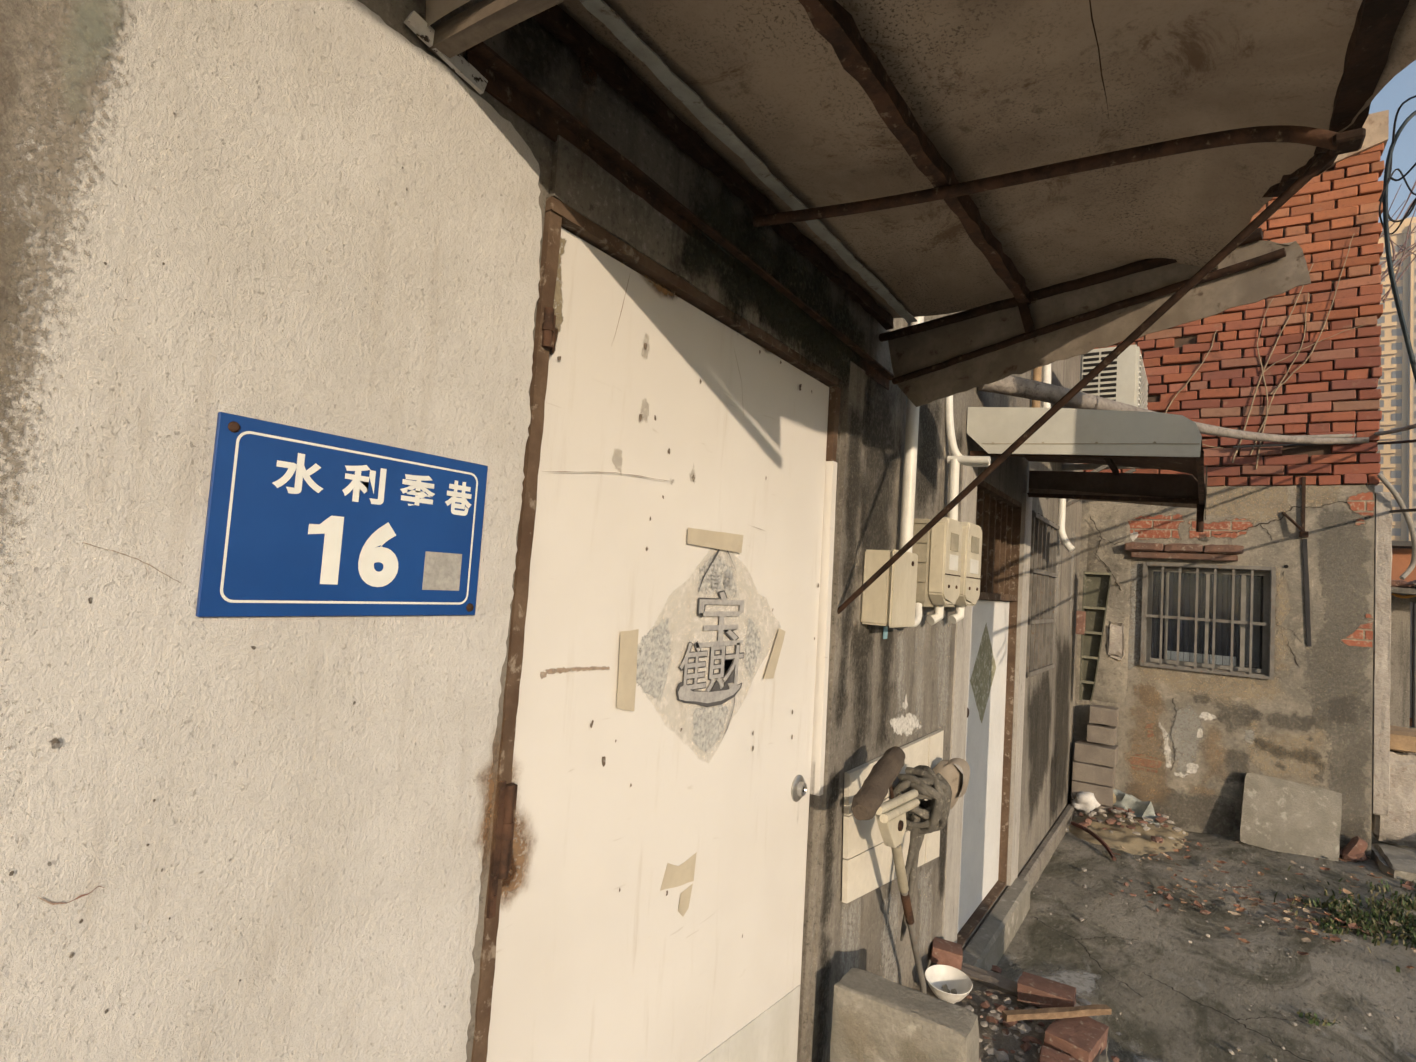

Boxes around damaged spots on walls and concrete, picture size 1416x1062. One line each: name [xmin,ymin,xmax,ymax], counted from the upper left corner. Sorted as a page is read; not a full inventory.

water stain [676,166,950,751]
peeling [1128,486,1375,541]
spalling [1126,563,1289,803]
spalling [1341,614,1373,647]
corrosion [481,746,514,853]
corrosion [501,815,530,902]
water stain [816,773,860,1062]
water stain [881,897,898,982]
water stain [919,820,948,948]